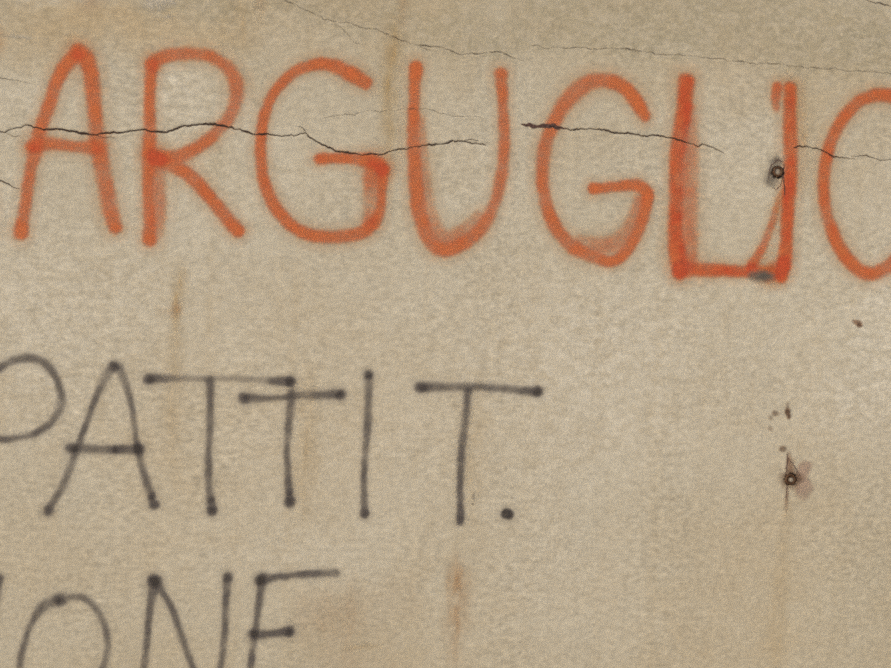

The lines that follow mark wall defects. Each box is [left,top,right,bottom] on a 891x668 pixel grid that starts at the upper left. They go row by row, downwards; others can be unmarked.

crack [0,118,486,159]
crack [521,120,724,158]
crack [794,145,891,164]
crack [0,180,20,193]